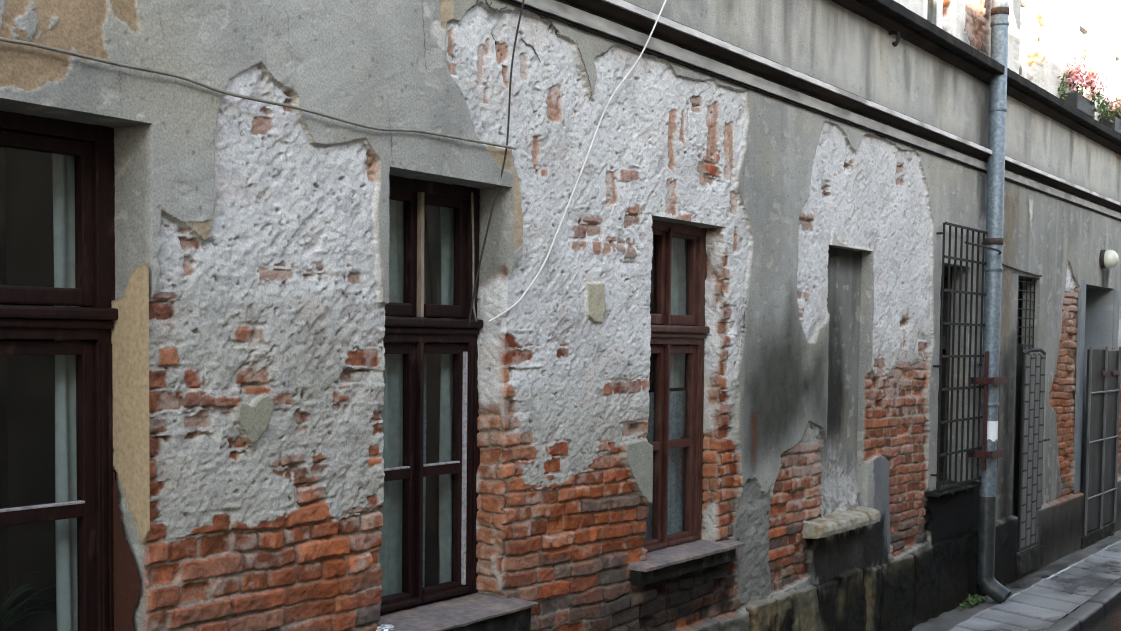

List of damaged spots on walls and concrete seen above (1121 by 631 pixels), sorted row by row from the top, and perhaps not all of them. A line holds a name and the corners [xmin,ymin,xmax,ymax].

peeling [0,0,140,92]
flaking render [113,62,387,631]
flaking render [440,0,754,631]
flaking render [797,121,934,556]
flaking render [1049,262,1081,496]
leakage [639,561,734,631]
leakage [769,603,795,631]
flaking render [767,421,827,593]
leakage [805,515,891,631]